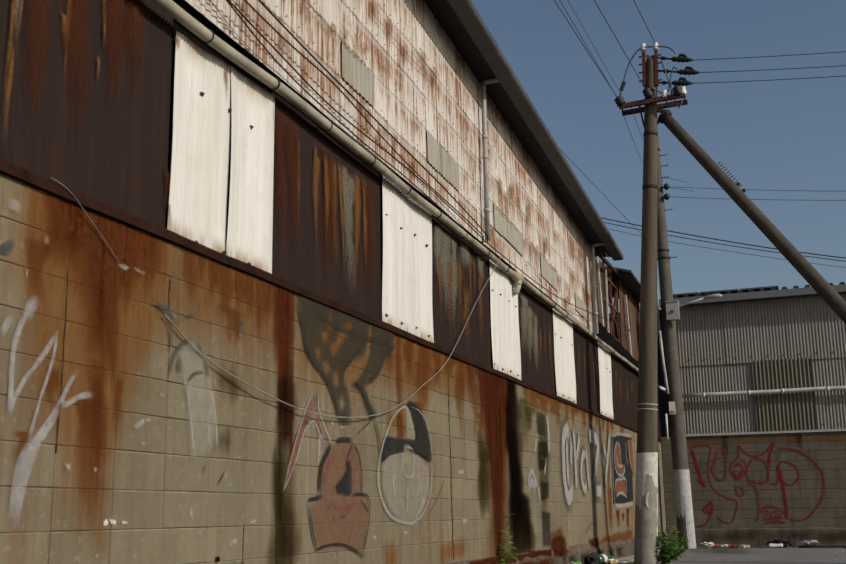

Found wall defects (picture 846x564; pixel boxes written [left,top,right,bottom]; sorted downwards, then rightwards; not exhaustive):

rust [7,0,23,104]
rust [370,0,437,85]
rust [276,114,300,212]
rust [314,149,344,250]
rust [354,177,374,260]
rust [496,178,531,230]
crack [56,274,68,454]
rust [275,284,295,448]
rust [470,366,569,564]
leakage [506,379,534,554]